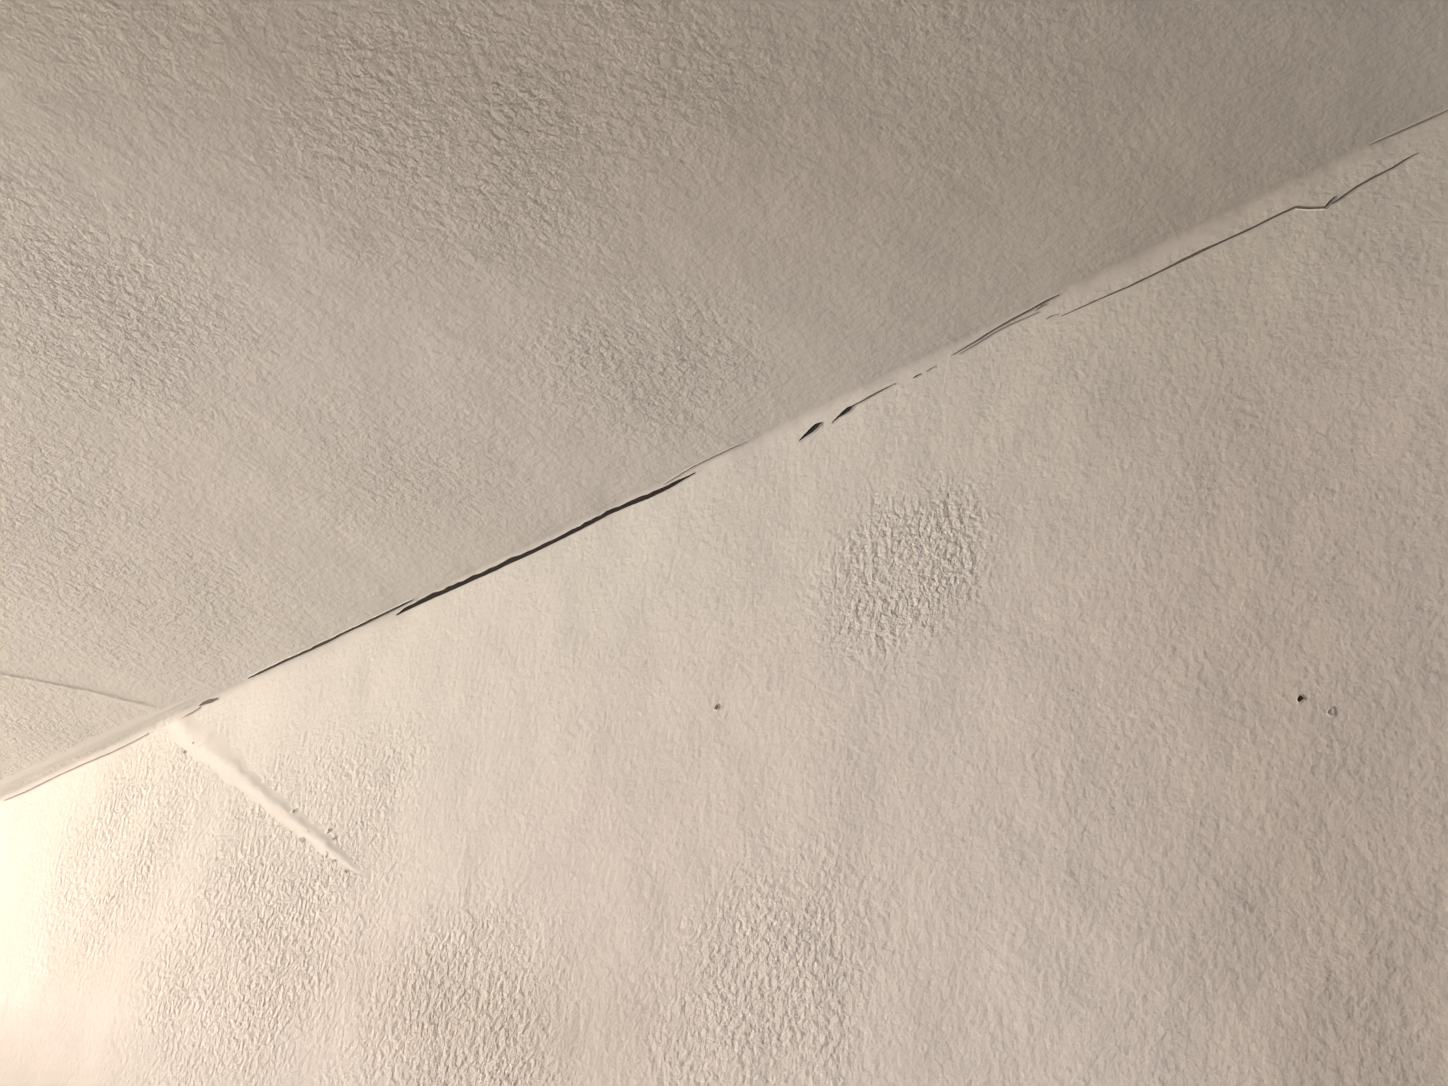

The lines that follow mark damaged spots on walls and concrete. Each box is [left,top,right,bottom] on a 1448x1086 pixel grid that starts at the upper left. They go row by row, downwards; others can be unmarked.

crack [951,109,1448,357]
crack [247,441,748,679]
crack [4,697,218,801]